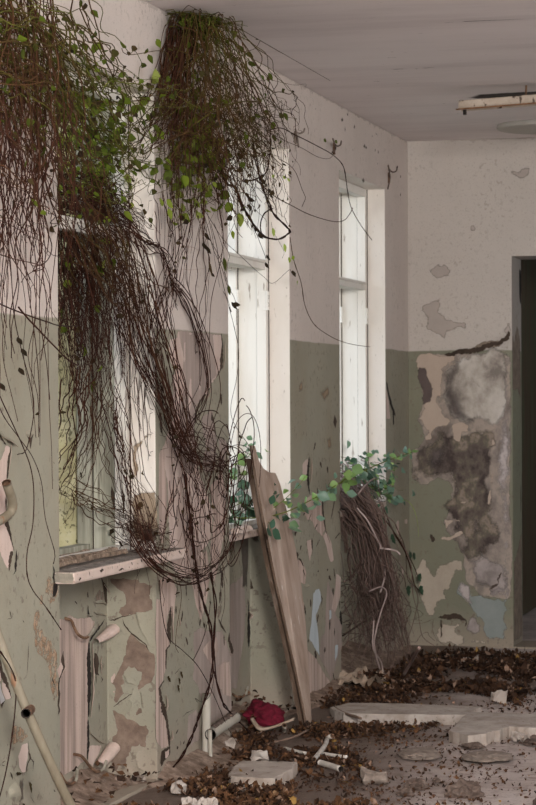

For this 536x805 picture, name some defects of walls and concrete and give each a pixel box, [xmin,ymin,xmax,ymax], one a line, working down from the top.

peeling [0,659,11,707]
peeling [0,429,17,573]
peeling [55,331,258,775]
peeling [296,459,352,693]
water stain [412,353,513,600]
flaking render [416,328,521,520]
peeling [416,533,522,646]
crack [445,331,510,356]